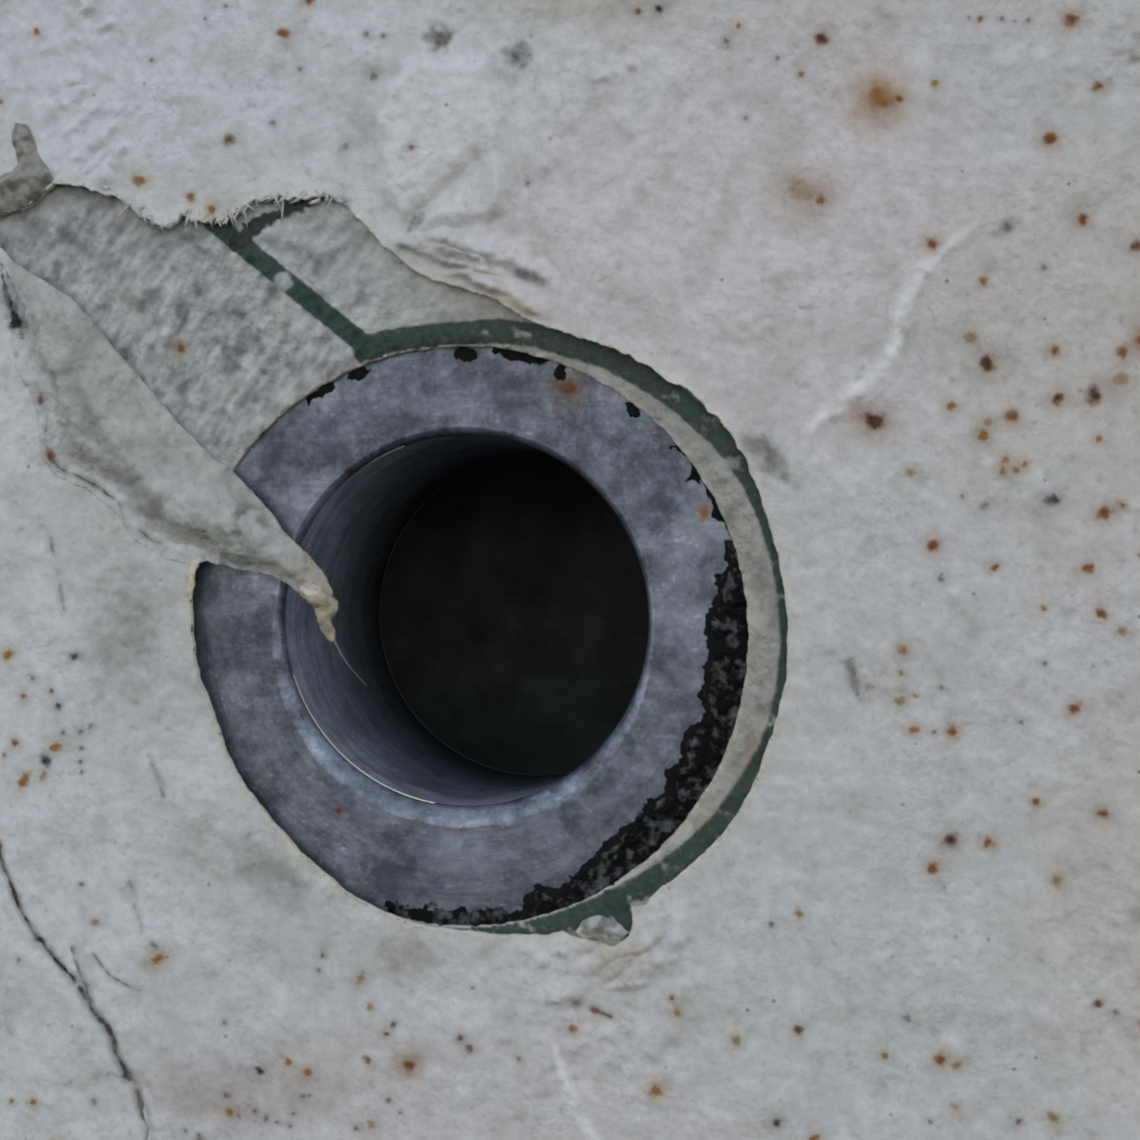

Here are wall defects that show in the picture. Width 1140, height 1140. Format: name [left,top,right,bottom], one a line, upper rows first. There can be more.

rust [980,356,993,371]
rust [1089,386,1101,403]
rust [865,412,883,430]
rust [978,419,991,440]
rust [1005,410,1018,421]
rust [1097,503,1125,519]
peeling [0,123,788,1063]
rust [909,727,957,736]
crack [0,843,175,1140]